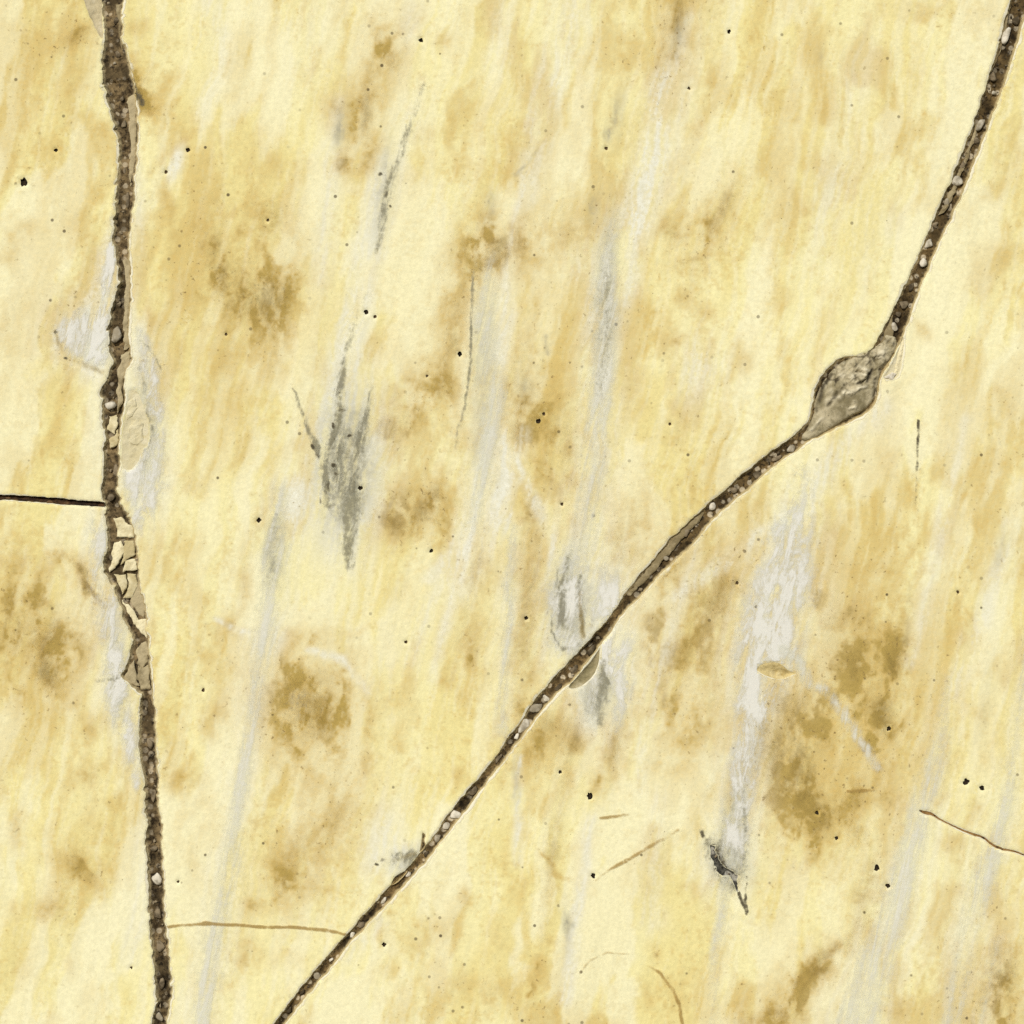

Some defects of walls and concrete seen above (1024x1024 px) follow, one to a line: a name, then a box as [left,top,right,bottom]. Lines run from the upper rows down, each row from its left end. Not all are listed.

crack [0,0,175,1024]
peeling [92,528,136,761]
crack [272,0,1024,1024]
damp [721,493,880,866]